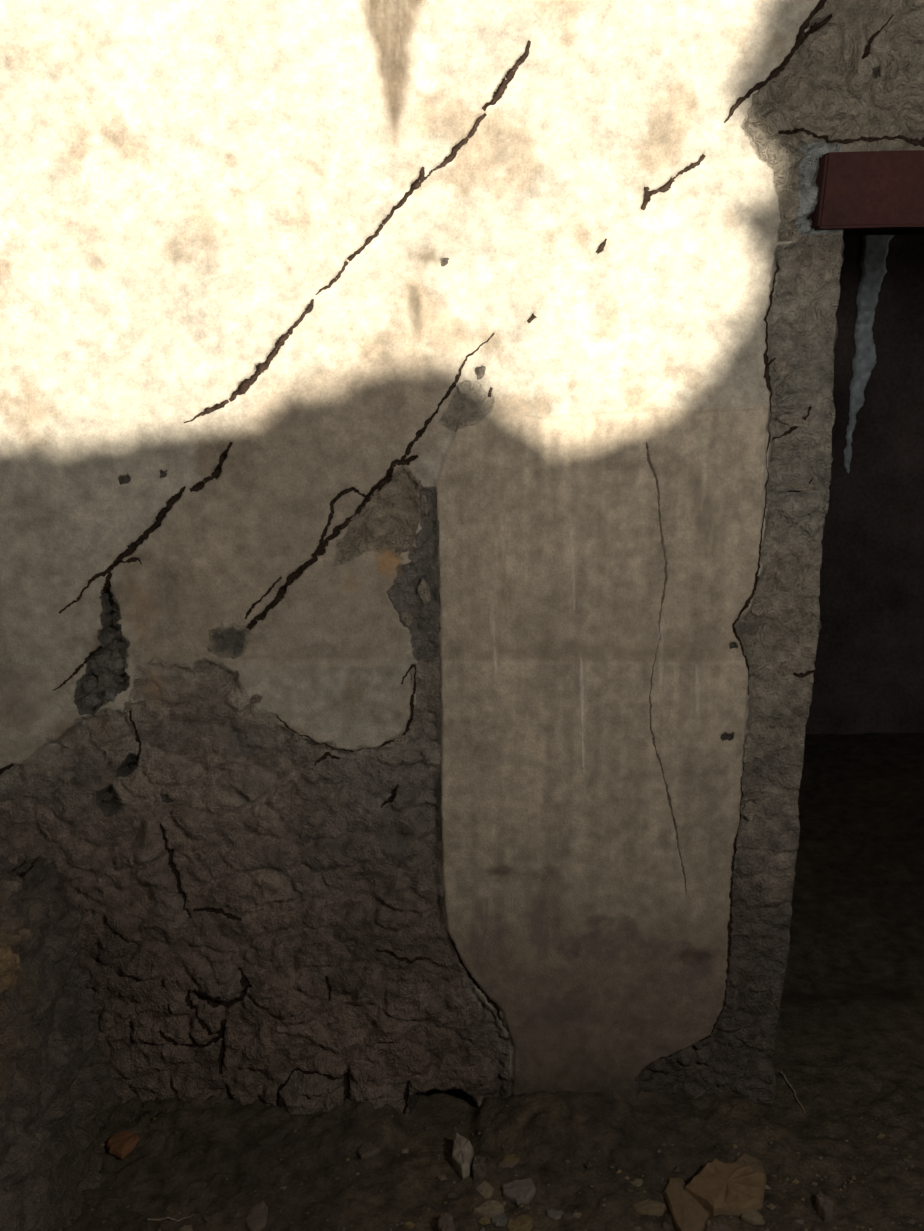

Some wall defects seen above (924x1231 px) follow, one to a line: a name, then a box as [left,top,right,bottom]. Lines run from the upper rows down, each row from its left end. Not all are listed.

crack [724,0,833,123]
crack [184,40,531,423]
crack [596,238,607,254]
crack [641,154,706,210]
crack [58,442,233,614]
crack [244,333,495,630]
flaking render [634,0,924,1104]
crack [53,646,103,691]
crack [646,442,687,893]
crack [160,823,241,921]
flaking render [0,465,511,1116]
crack [159,967,252,1075]